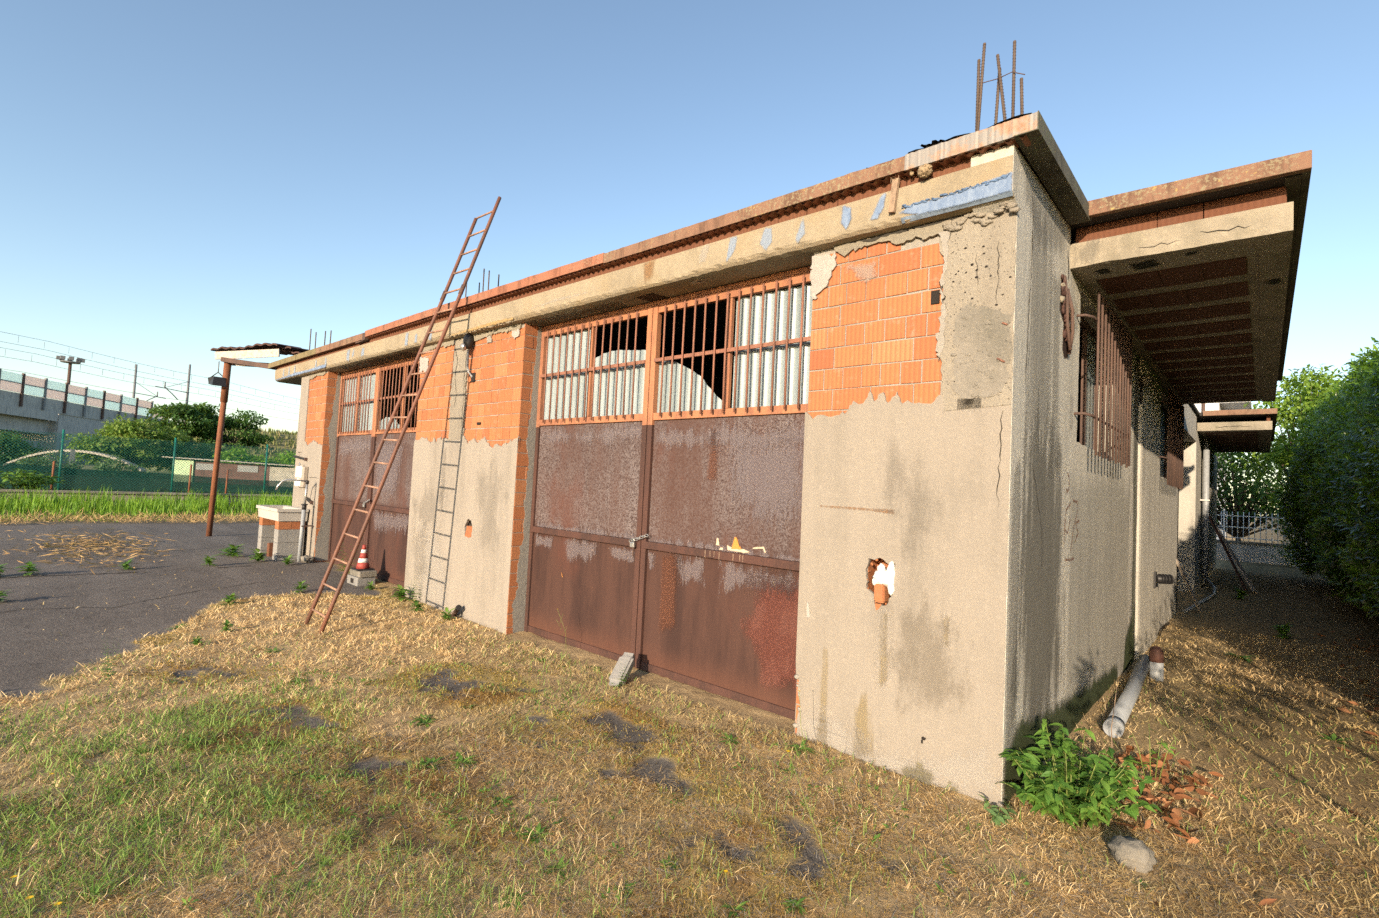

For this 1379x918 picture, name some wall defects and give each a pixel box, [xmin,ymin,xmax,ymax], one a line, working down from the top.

peeling [726,237,737,261]
peeling [760,228,772,249]
flaking render [808,172,1013,418]
flaking render [277,329,332,445]
flaking render [405,318,526,448]
rust [747,584,799,687]
spalling [867,558,895,610]